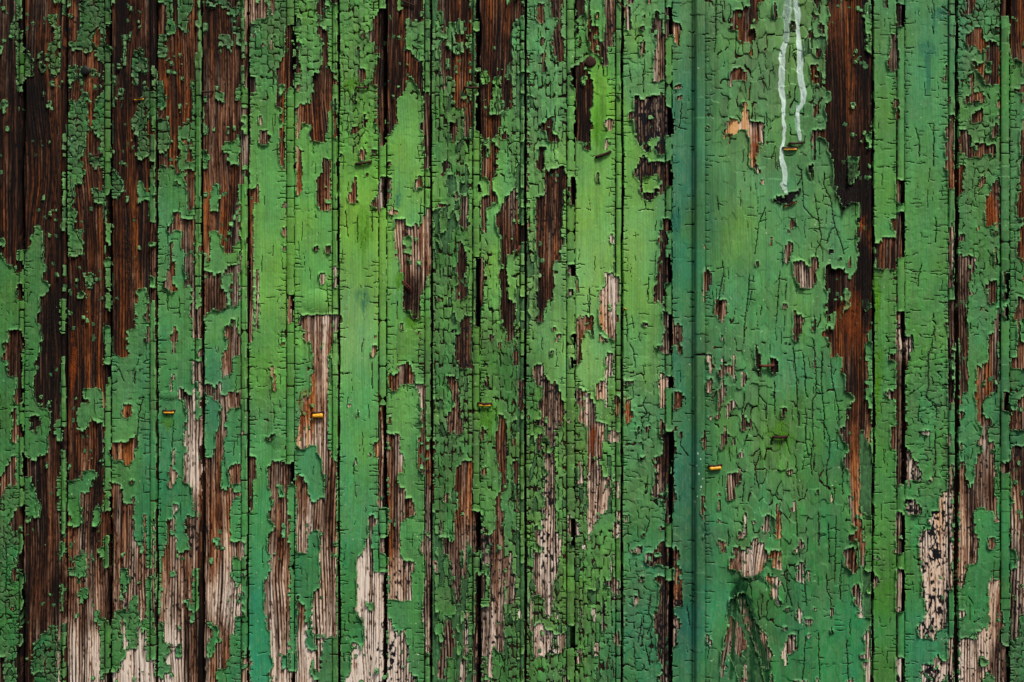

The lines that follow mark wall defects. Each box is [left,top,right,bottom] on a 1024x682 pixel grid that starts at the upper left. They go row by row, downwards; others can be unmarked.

peeling [0,0,341,682]
peeling [345,0,683,682]
crack [710,0,718,50]
peeling [723,102,764,184]
crack [717,262,786,333]
crack [741,342,844,495]
crack [797,172,848,256]
peeling [783,0,933,682]
peeling [894,227,1024,682]
peeling [944,0,1024,196]
peeling [706,501,817,682]
crack [785,515,850,680]